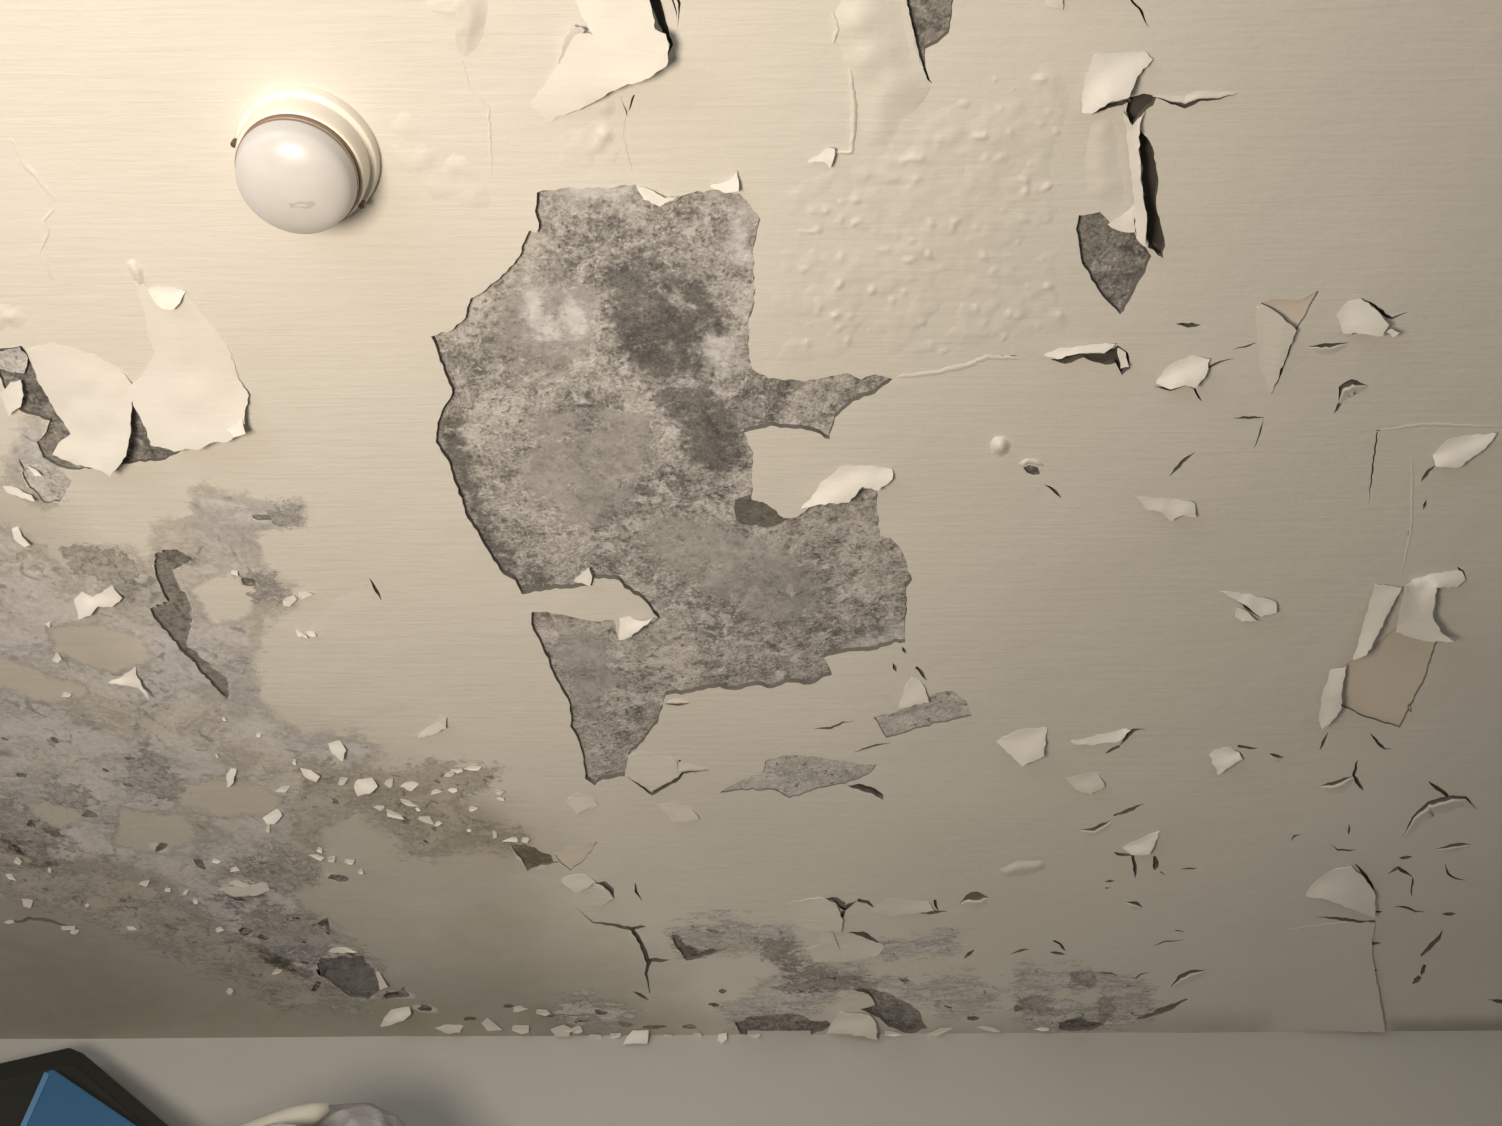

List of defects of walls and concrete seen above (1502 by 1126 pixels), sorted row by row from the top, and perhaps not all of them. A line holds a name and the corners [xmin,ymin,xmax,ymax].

peeling [530,0,669,122]
flaking render [907,0,951,78]
flaking render [1076,52,1163,310]
peeling [0,281,249,507]
flaking render [435,172,911,814]
spalling [0,485,613,1027]
flaking render [875,677,971,736]
peeling [996,727,1047,766]
crack [1320,734,1383,829]
crack [1348,781,1476,921]
crack [591,881,667,995]
spalling [435,897,1163,1045]